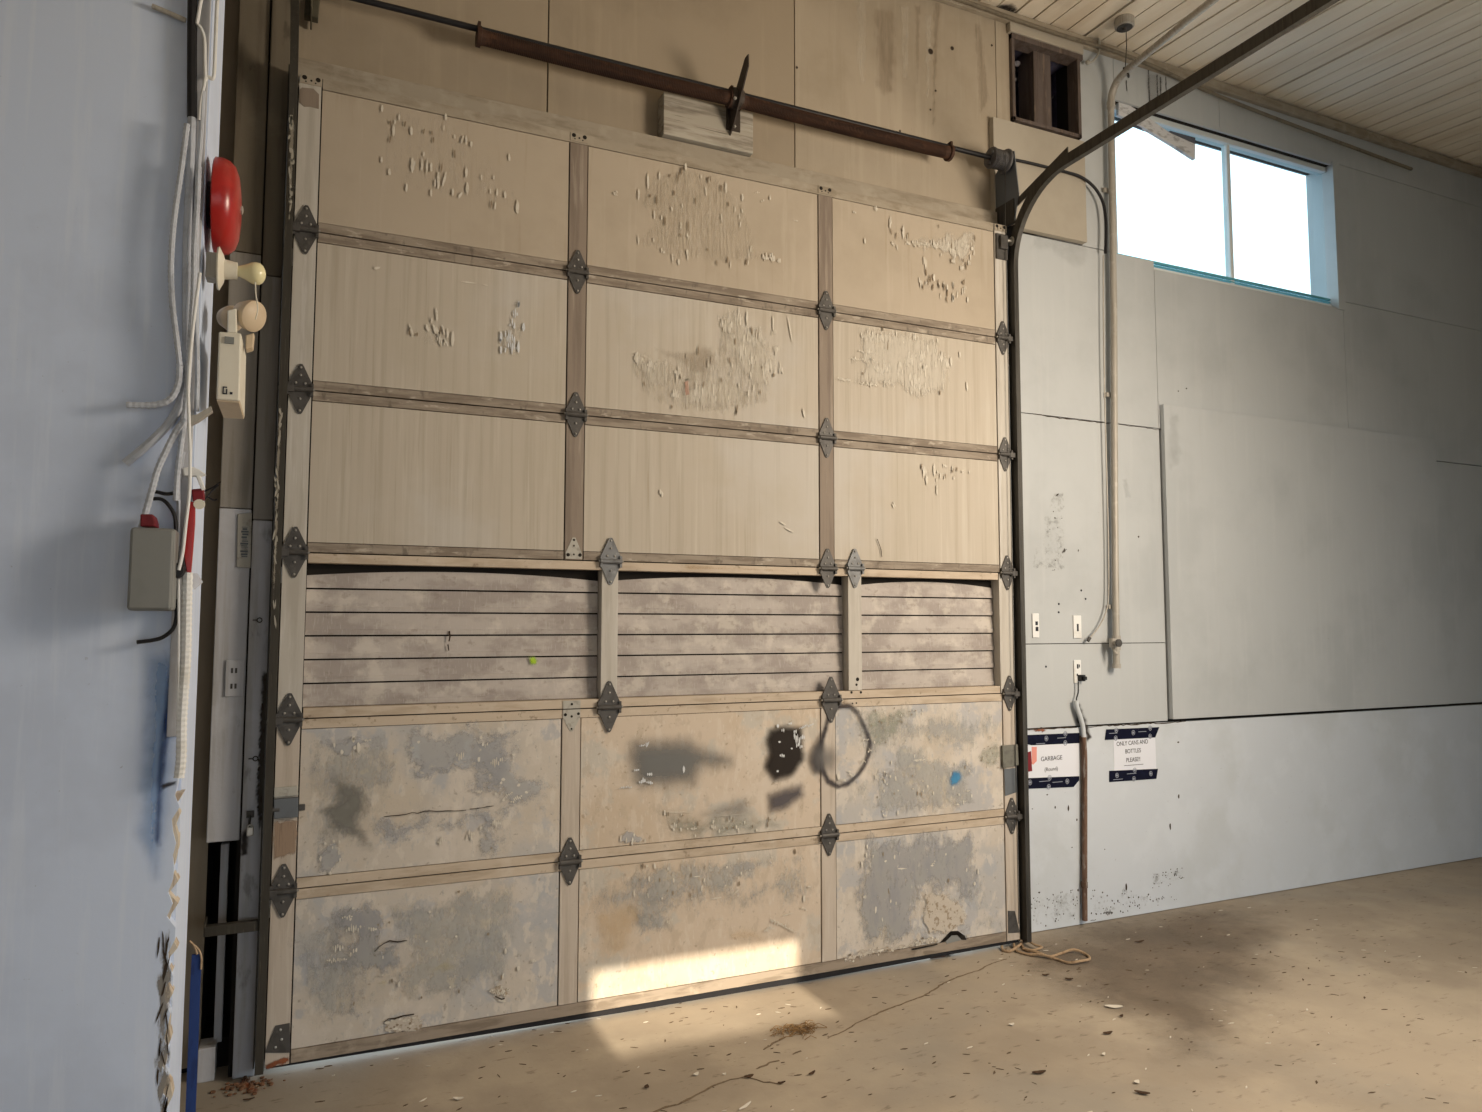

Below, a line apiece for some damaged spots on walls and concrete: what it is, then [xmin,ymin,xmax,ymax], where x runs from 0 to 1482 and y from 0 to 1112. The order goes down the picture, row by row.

peeling [381,105,519,214]
peeling [638,163,771,265]
peeling [671,308,793,415]
spalling [205,841,237,1025]
peeling [327,903,400,977]
peeling [843,831,982,962]
spalling [155,931,171,1112]
spalling [385,1016,423,1033]